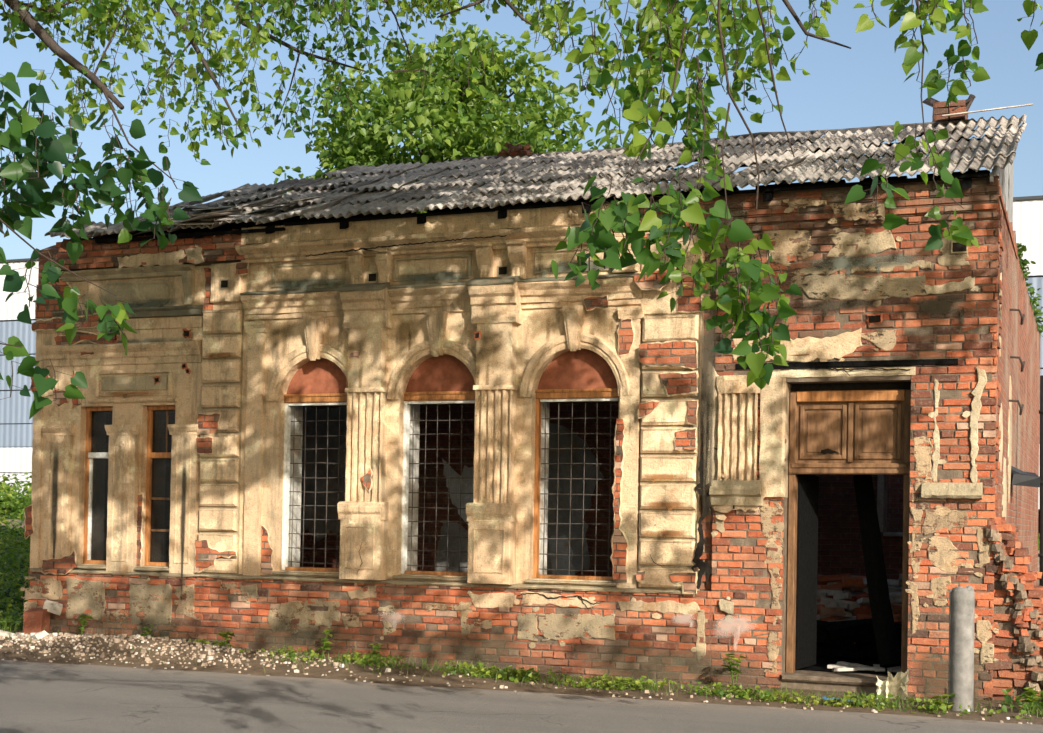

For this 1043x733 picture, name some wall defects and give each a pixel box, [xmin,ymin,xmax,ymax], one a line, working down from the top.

flaking render [117,244,214,311]
flaking render [732,198,980,362]
flaking render [196,412,221,455]
crack [517,593,605,610]
flaking render [425,570,708,660]
flaking render [547,418,645,583]
flaking render [617,318,743,484]
flaking render [709,480,785,673]
flaking render [905,367,992,634]
flaking render [974,614,999,668]